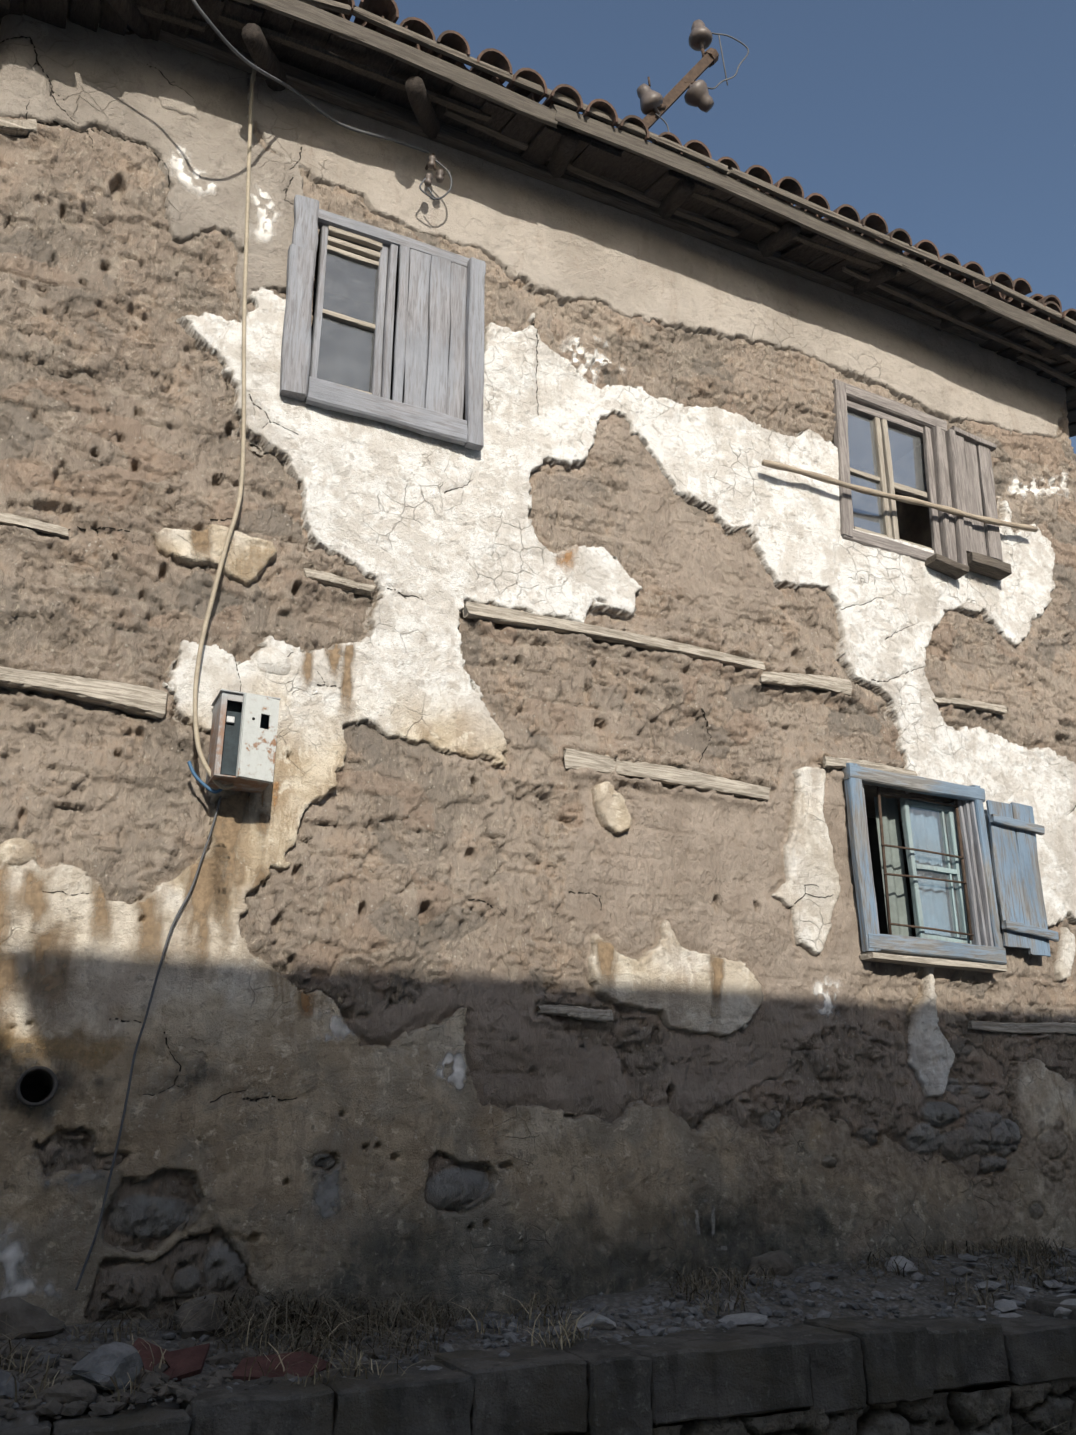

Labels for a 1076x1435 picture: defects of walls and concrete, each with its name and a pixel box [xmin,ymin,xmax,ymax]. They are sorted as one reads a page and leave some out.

crack [0,36,170,187]
flaking render [158,85,198,119]
flaking render [0,116,378,904]
flaking render [299,167,1076,764]
water stain [0,865,122,1068]
water stain [137,896,161,954]
water stain [184,791,269,962]
flaking render [238,413,1076,1178]